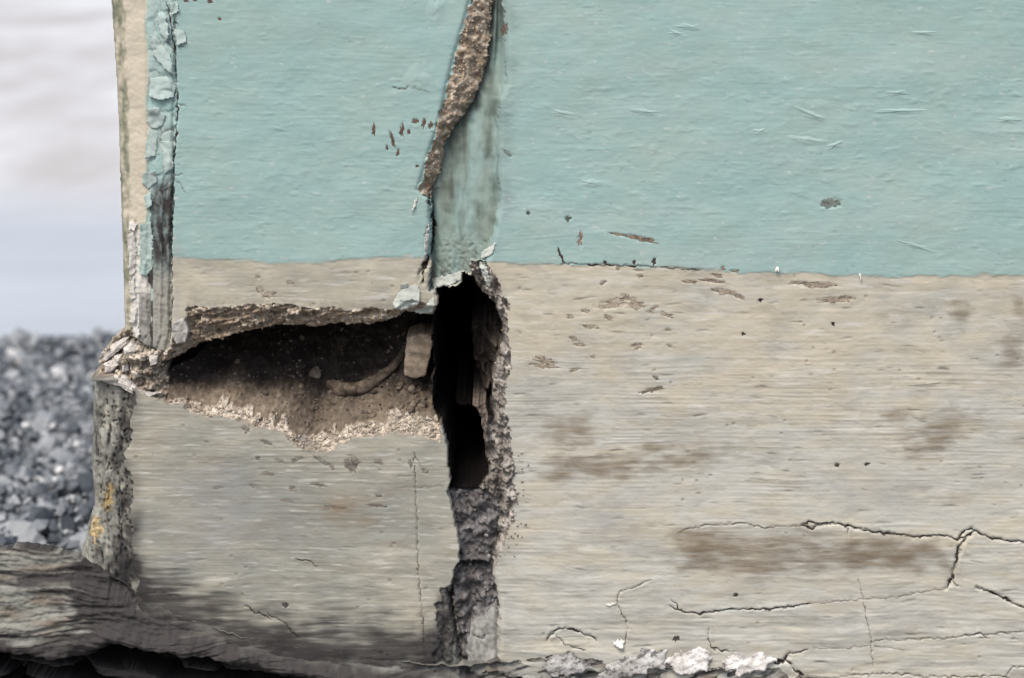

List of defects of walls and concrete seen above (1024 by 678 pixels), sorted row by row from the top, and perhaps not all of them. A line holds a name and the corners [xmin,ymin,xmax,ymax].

peeling [142,0,213,209]
spalling [386,0,508,211]
peeling [480,242,496,288]
spalling [93,221,461,474]
spalling [433,585,463,665]
crack [413,454,488,666]
crack [547,627,596,650]
crack [616,579,652,643]
crack [669,521,1024,678]